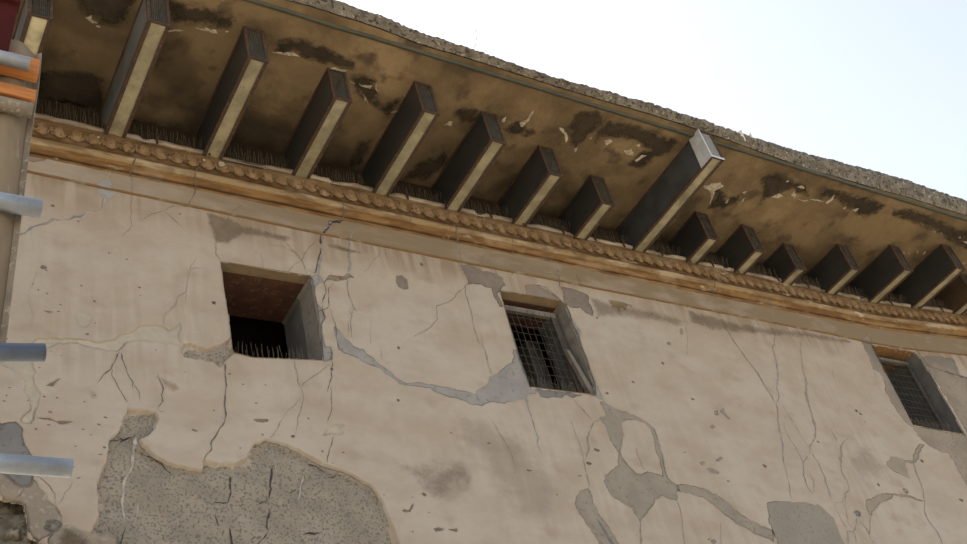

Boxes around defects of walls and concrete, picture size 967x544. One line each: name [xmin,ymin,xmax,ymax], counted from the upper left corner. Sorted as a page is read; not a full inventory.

water stain [169,2,233,28]
water stain [277,38,400,115]
water stain [571,111,677,168]
water stain [762,174,808,199]
water stain [822,189,967,250]
peeling [33,324,232,375]
crack [261,195,386,478]
peeling [0,362,71,430]
crack [203,362,228,462]
crack [711,279,874,544]
peeling [94,411,393,544]
crack [258,466,296,544]